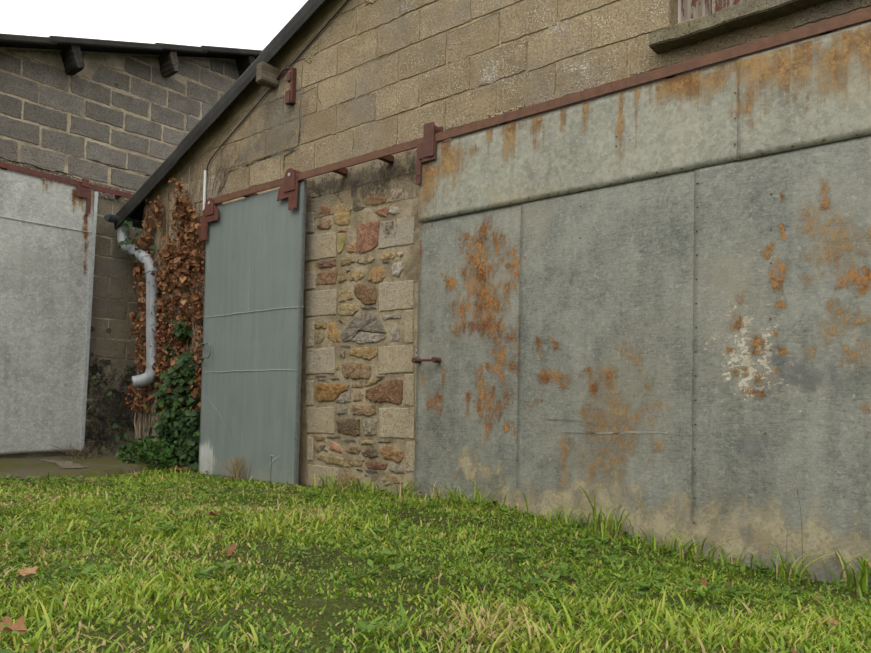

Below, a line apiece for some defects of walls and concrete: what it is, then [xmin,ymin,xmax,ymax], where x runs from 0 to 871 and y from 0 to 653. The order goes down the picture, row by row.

corrosion [656,27,871,115]
corrosion [422,140,477,199]
corrosion [72,190,94,250]
corrosion [760,223,788,308]
corrosion [800,180,871,345]
corrosion [441,216,525,446]
corrosion [750,330,787,356]
corrosion [538,365,668,493]